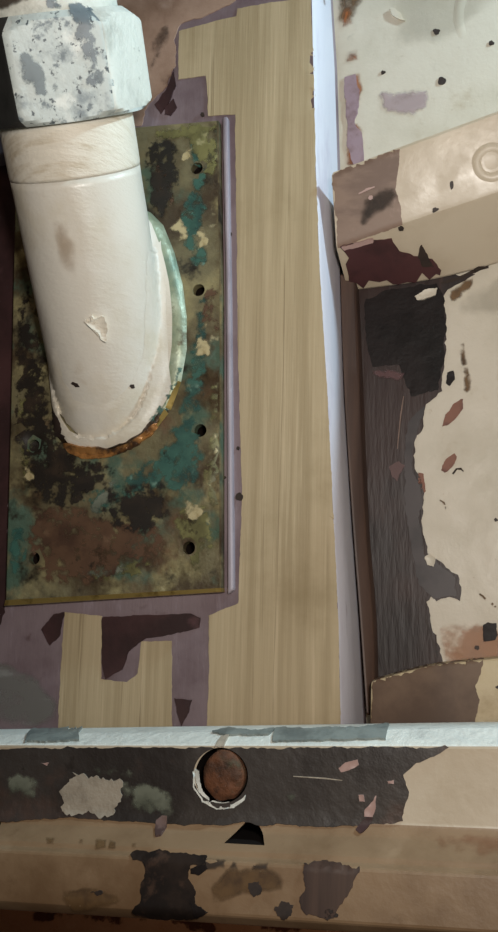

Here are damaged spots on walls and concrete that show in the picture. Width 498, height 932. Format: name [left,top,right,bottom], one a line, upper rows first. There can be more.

peeling [21,52,47,95]
peeling [46,0,101,86]
spalling [84,315,108,342]
peeling [178,0,389,743]
peeling [52,411,65,439]
peeling [340,226,475,677]
peeling [0,612,449,837]
peeling [130,849,208,921]
peeling [248,881,262,897]
peeling [274,860,360,921]